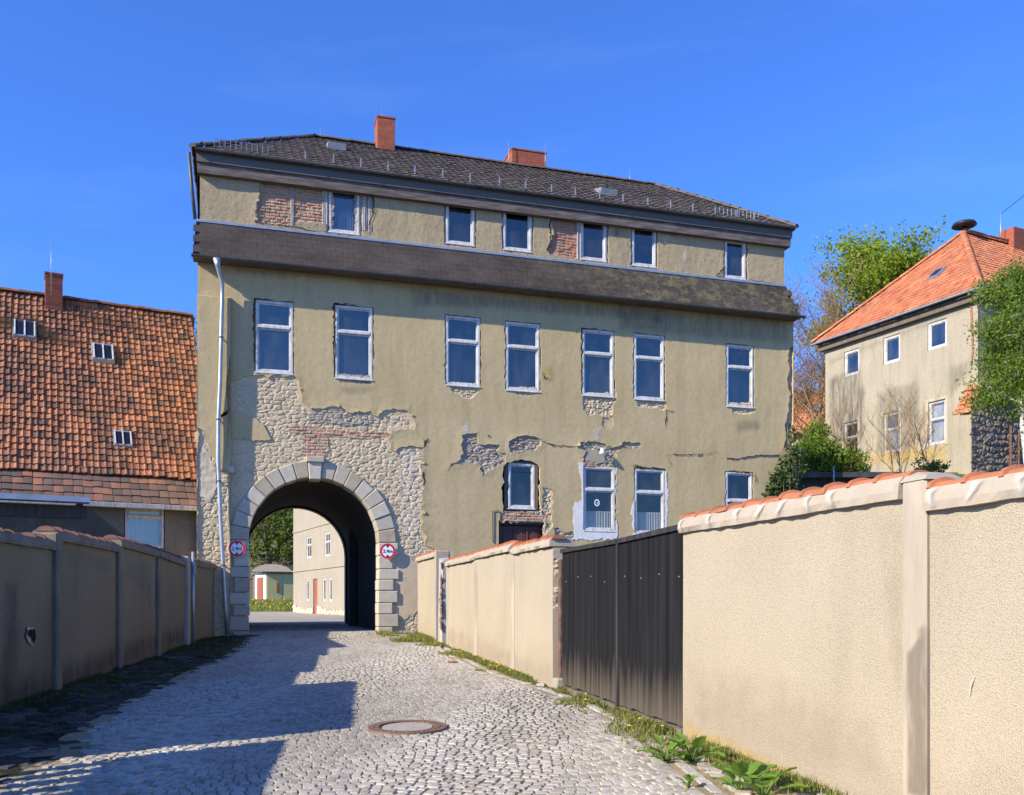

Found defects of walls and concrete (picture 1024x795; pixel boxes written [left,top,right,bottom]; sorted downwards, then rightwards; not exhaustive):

flaking render [254,166,334,227]
flaking render [546,206,582,261]
peeling [450,382,481,399]
peeling [582,389,617,430]
peeling [450,433,541,475]
crack [633,451,757,482]
peeling [195,373,434,636]